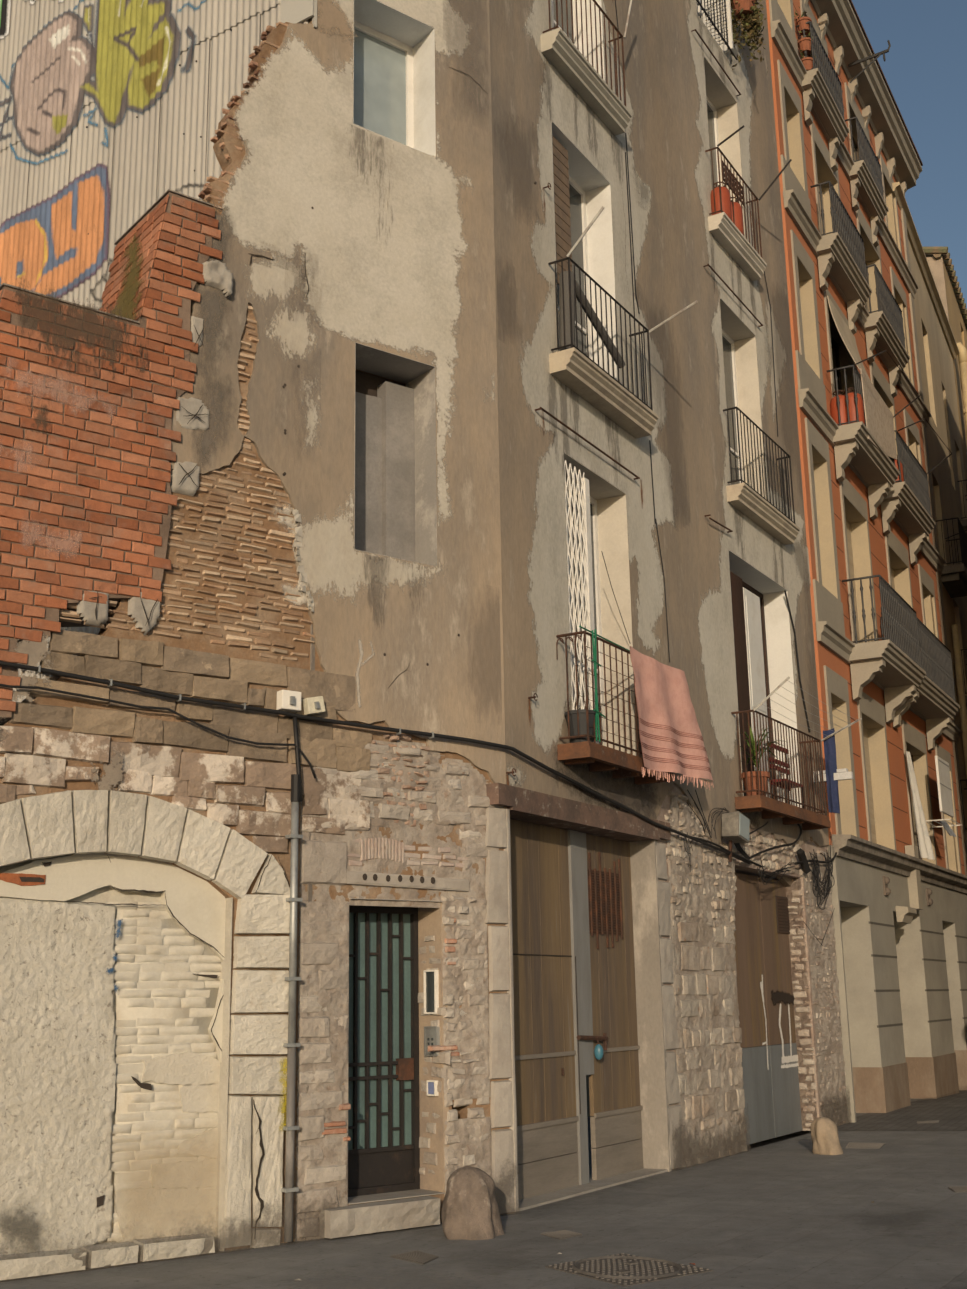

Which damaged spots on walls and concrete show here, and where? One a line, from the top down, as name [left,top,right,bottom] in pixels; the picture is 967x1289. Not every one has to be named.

spalling [198,22,288,210]
flaking render [59,438,315,662]
spalling [131,1076,152,1090]
crack [253,1100,265,1224]